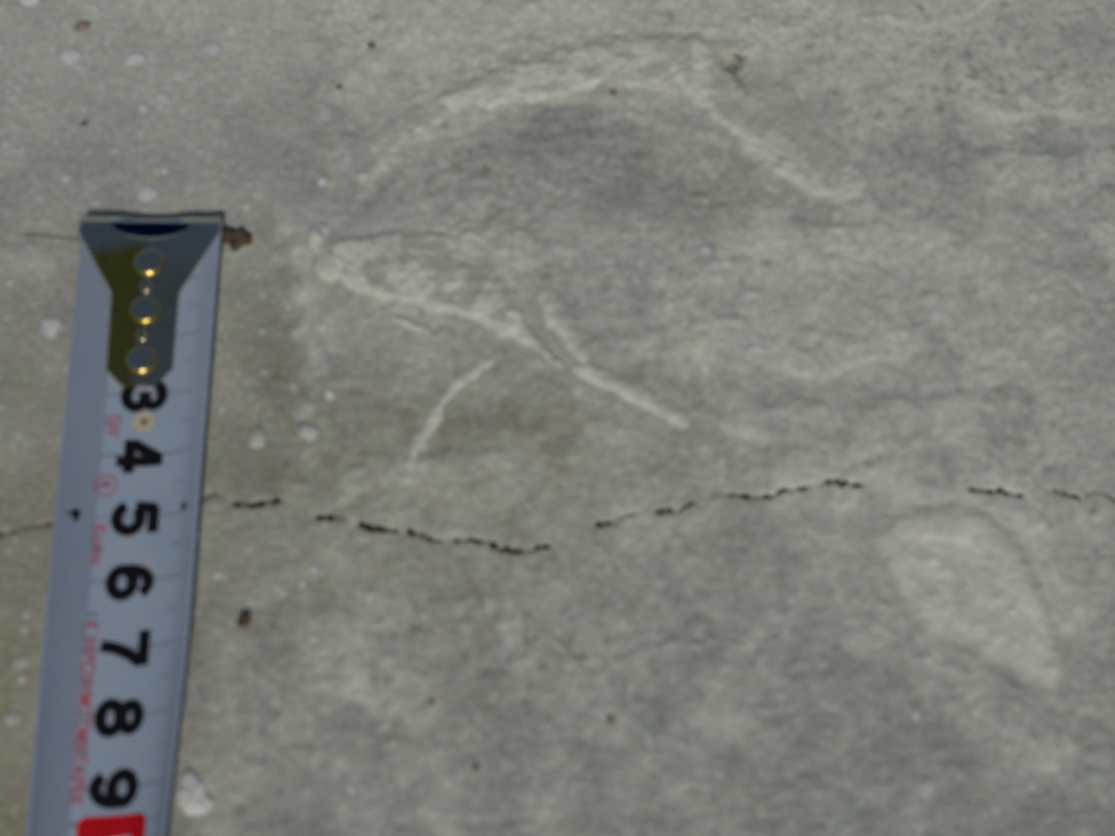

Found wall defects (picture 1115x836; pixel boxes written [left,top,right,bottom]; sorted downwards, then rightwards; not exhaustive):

crack [199,494,284,509]
crack [594,478,865,528]
crack [968,487,1024,498]
crack [1052,489,1115,502]
crack [314,514,552,555]